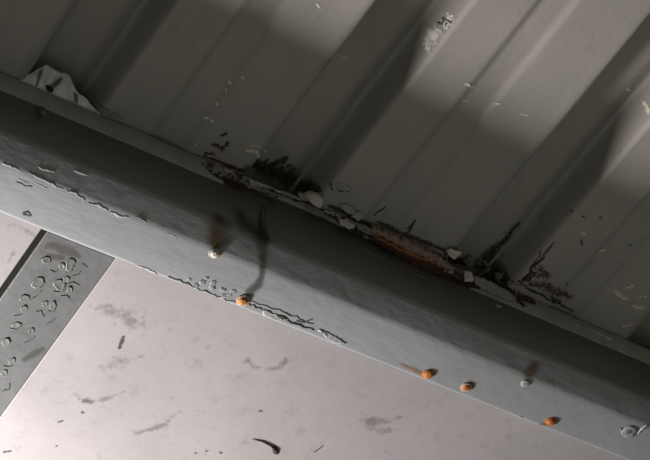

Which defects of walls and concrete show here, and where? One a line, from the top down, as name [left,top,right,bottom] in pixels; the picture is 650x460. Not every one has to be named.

peeling [422,13,453,53]
peeling [2,163,128,218]
leakage [245,156,307,195]
peeling [240,174,382,237]
rust [354,224,480,290]
rust [529,265,573,304]